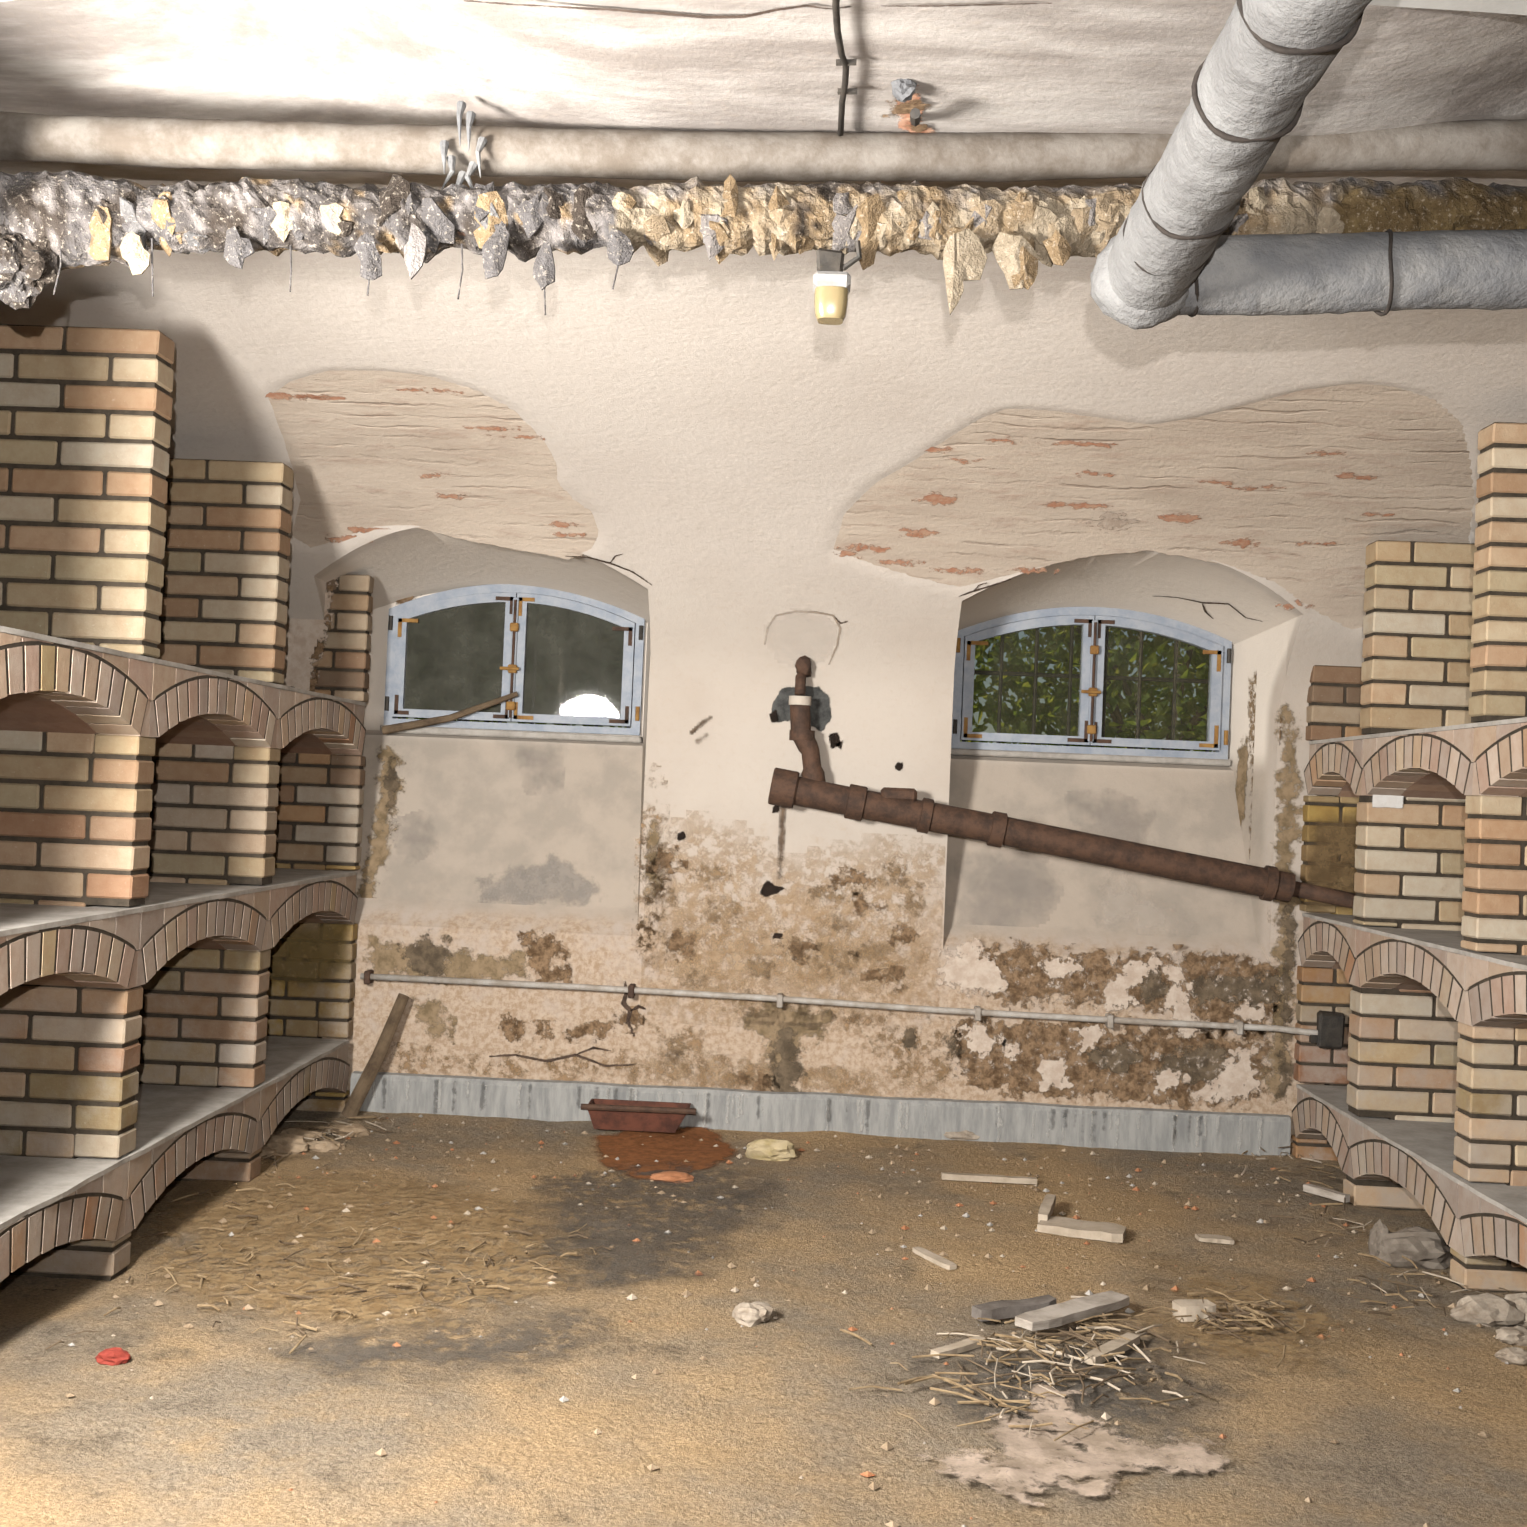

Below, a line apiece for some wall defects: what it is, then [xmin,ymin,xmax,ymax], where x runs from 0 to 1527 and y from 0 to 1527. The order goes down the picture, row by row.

peeling [88,191,303,275]
peeling [319,174,456,280]
peeling [473,174,739,290]
peeling [768,186,1119,315]
peeling [1222,187,1269,235]
spalling [266,370,598,559]
spalling [834,384,1475,629]
crack [1154,596,1262,622]
corrosion [778,807,786,874]
water stain [637,807,923,1012]
water stain [798,1066,864,1131]
water stain [844,1011,965,1084]